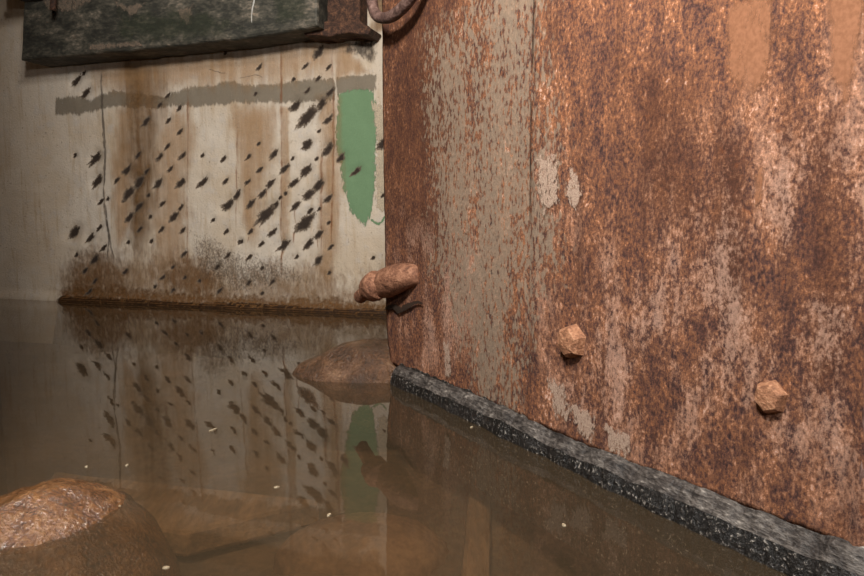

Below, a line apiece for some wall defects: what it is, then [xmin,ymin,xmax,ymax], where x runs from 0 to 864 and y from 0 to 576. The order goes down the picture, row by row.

mould [347,41,373,60]
water stain [53,253,387,362]